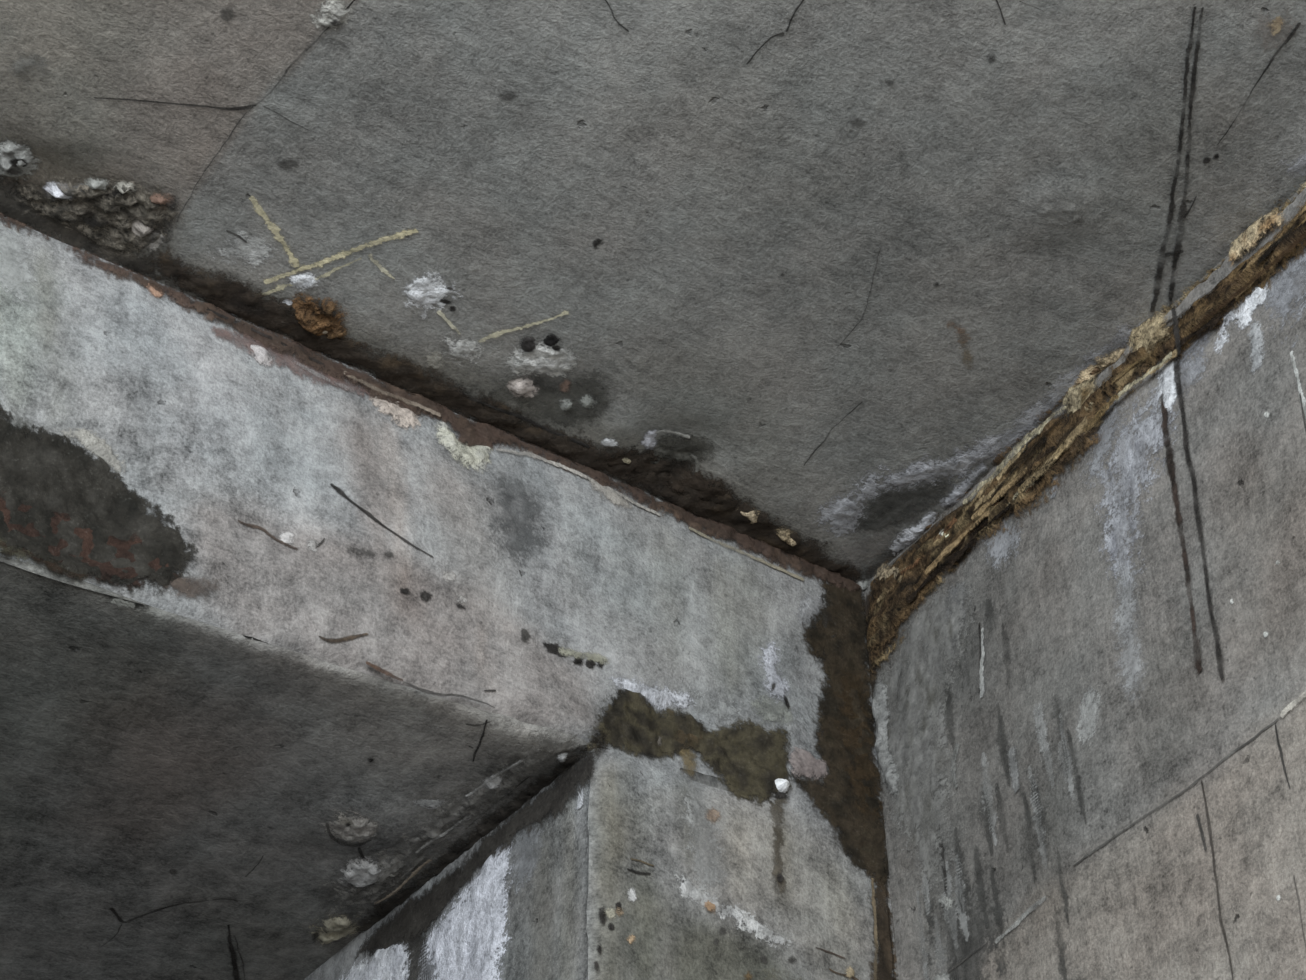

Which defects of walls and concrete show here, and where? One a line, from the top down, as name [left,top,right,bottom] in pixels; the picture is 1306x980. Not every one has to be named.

crack [284,0,355,76]
spalling [0,139,179,254]
crack [94,97,310,222]
damp [290,272,319,290]
rust [282,292,347,339]
damp [404,272,461,319]
crack [1150,6,1301,680]
damp [1229,182,1306,266]
damp [0,404,210,609]
damp [817,393,1065,538]
damp [341,677,792,980]
damp [916,712,1010,980]